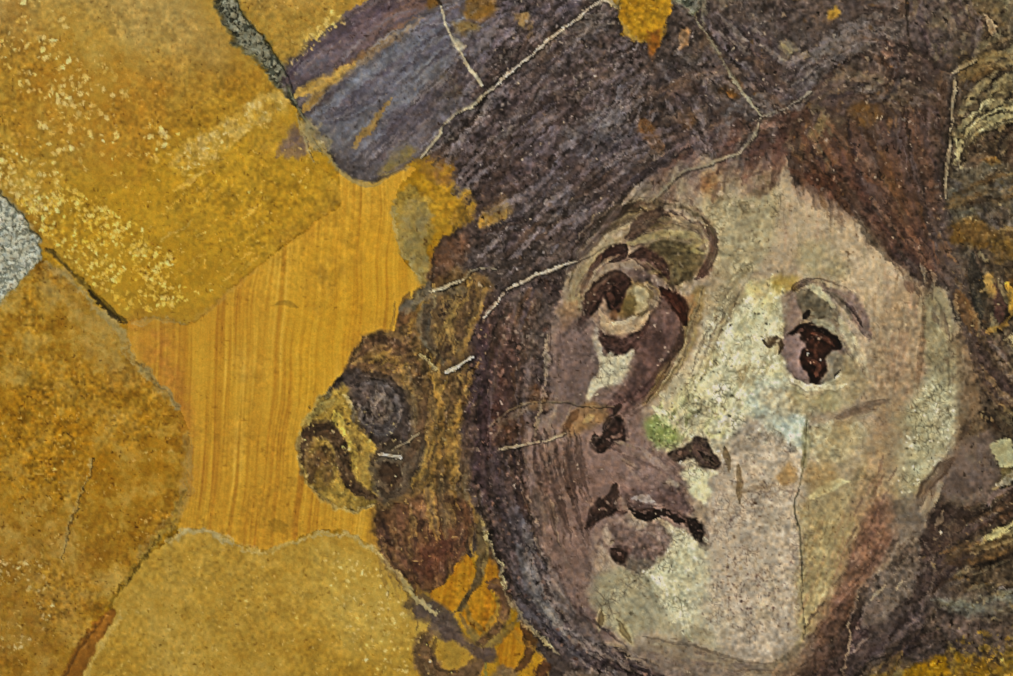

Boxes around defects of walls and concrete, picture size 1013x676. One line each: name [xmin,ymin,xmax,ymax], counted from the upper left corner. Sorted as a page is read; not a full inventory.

flaking render [0,0,187,313]
flaking render [144,0,291,176]
crack [421,0,620,159]
flaking render [672,0,701,17]
crack [650,18,811,204]
crack [429,242,617,319]
crack [793,416,809,640]
crack [62,609,117,676]